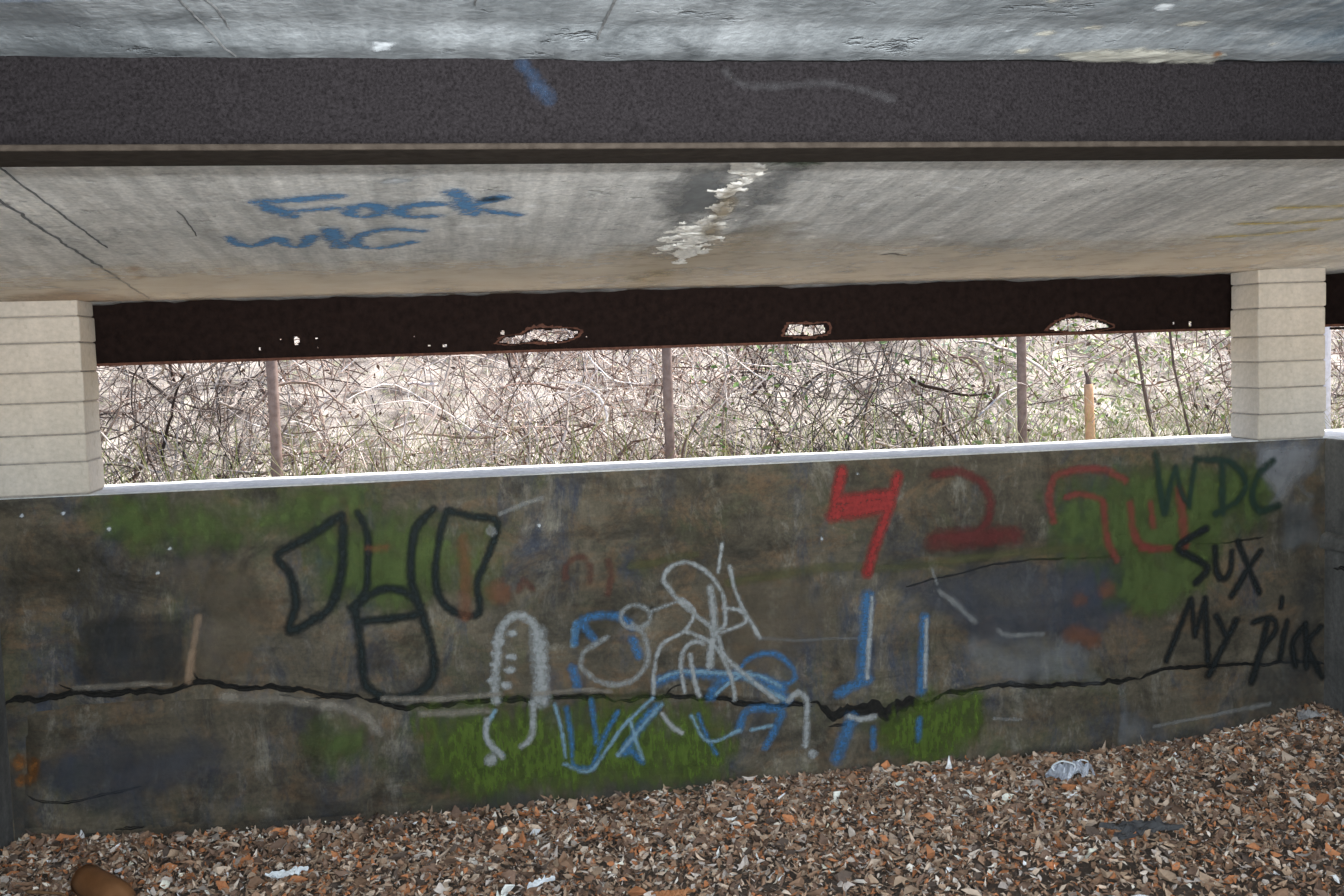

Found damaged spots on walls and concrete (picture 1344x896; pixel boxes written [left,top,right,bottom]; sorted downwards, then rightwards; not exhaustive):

crack [0,167,150,299]
leakage [638,163,804,281]
crack [5,651,1324,734]
crack [27,786,142,804]
crack [115,824,144,832]